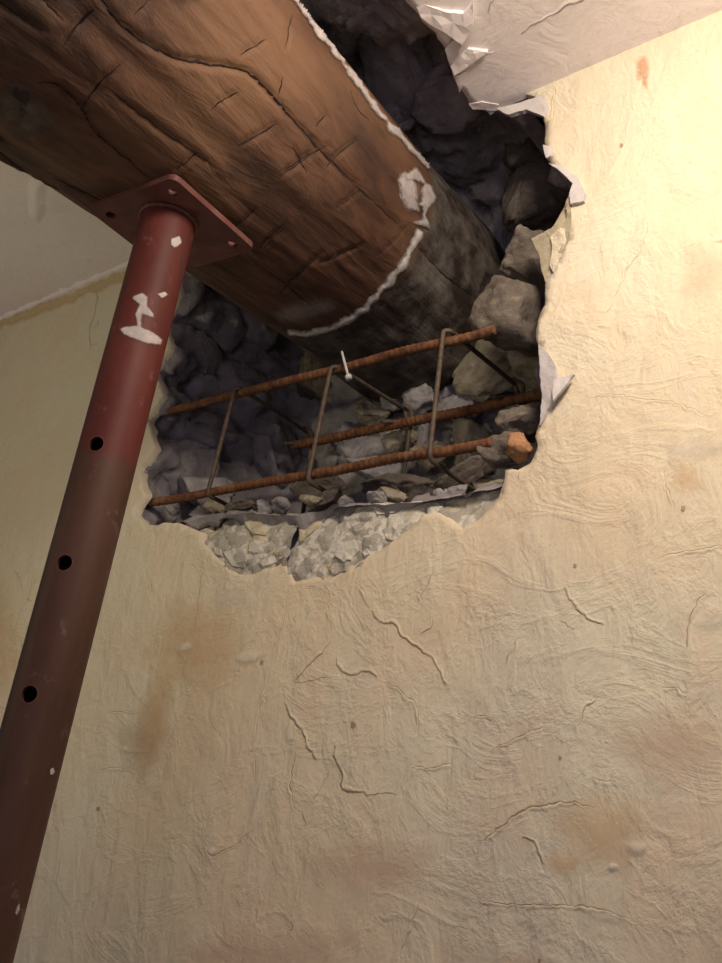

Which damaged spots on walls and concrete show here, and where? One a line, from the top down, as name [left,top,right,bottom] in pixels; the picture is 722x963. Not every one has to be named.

peeling [416,1,488,93]
crack [521,0,584,33]
peeling [469,95,550,118]
crack [0,0,408,349]
peeling [531,145,587,282]
peeling [538,345,575,426]
spalling [199,489,501,582]
crack [354,573,448,684]
crack [561,586,606,628]
crack [285,637,419,825]
crack [476,778,613,864]
crack [465,887,638,926]